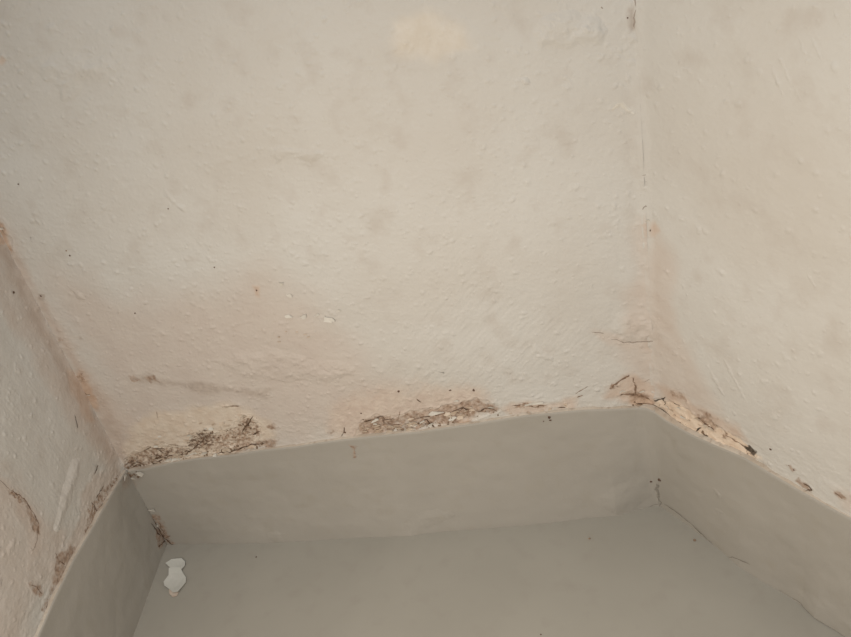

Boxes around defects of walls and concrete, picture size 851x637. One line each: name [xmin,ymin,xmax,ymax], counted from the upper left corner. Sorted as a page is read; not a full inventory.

peeling [121,399,284,470]
water stain [0,178,444,615]
peeling [321,370,506,439]
peeling [653,382,767,463]